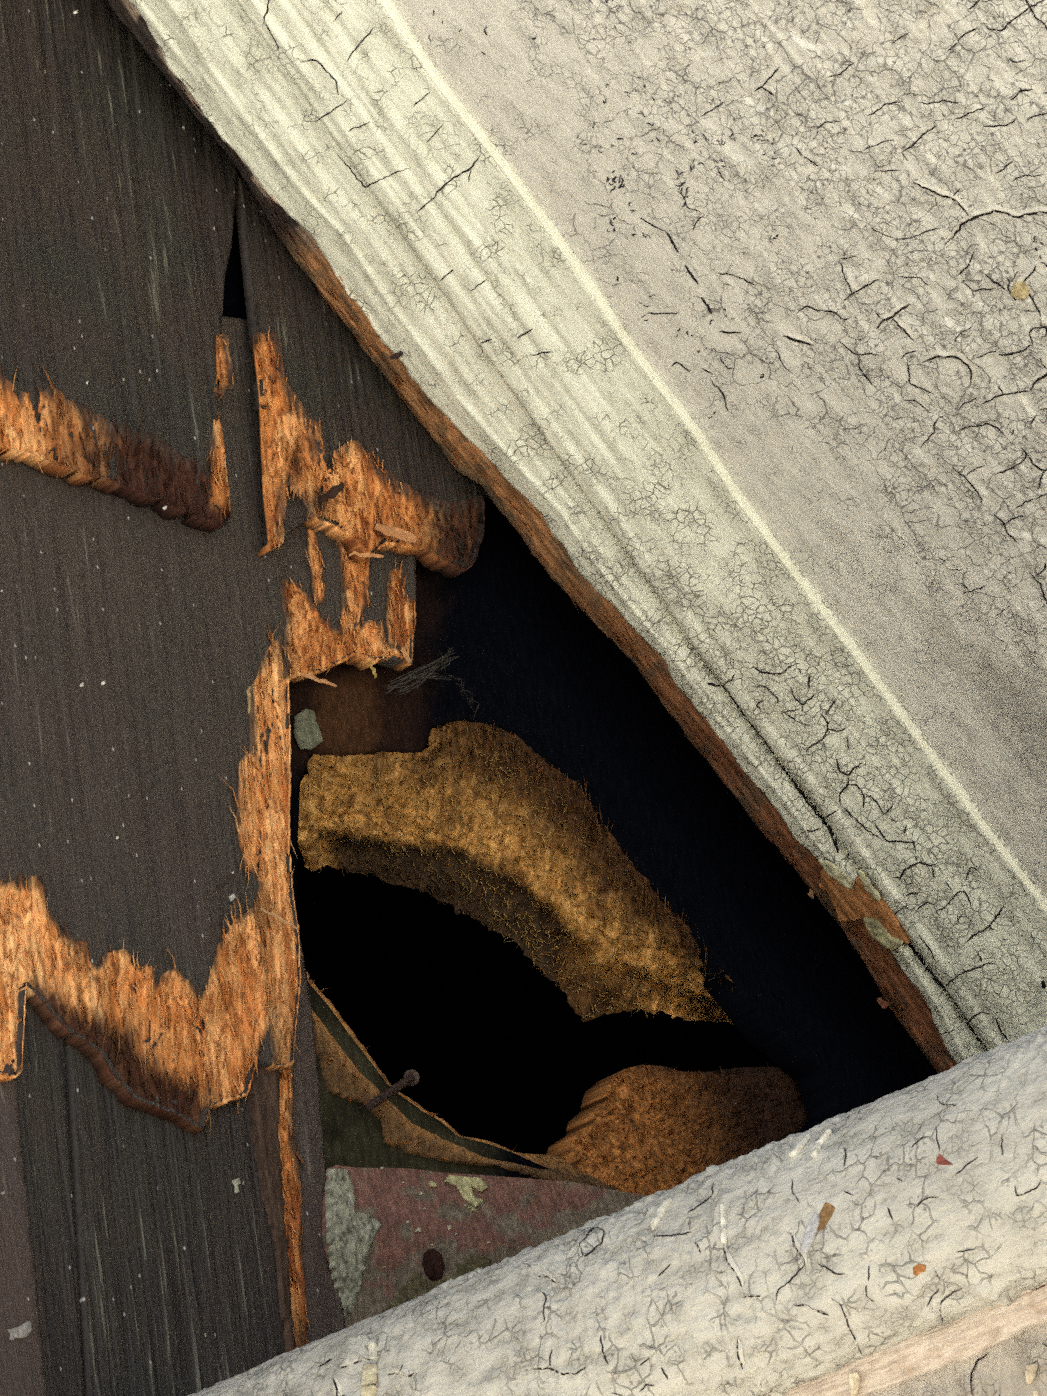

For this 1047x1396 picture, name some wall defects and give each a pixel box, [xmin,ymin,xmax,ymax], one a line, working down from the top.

crack [262,0,442,188]
crack [417,155,480,213]
crack [639,191,754,411]
crack [776,0,1047,543]
crack [753,663,1004,987]
peeling [818,859,911,951]
peeling [325,1169,383,1318]
peeling [429,1175,488,1213]
crack [533,1270,668,1396]
peeling [650,1197,672,1230]
crack [652,1181,874,1354]
crack [887,1097,1003,1220]